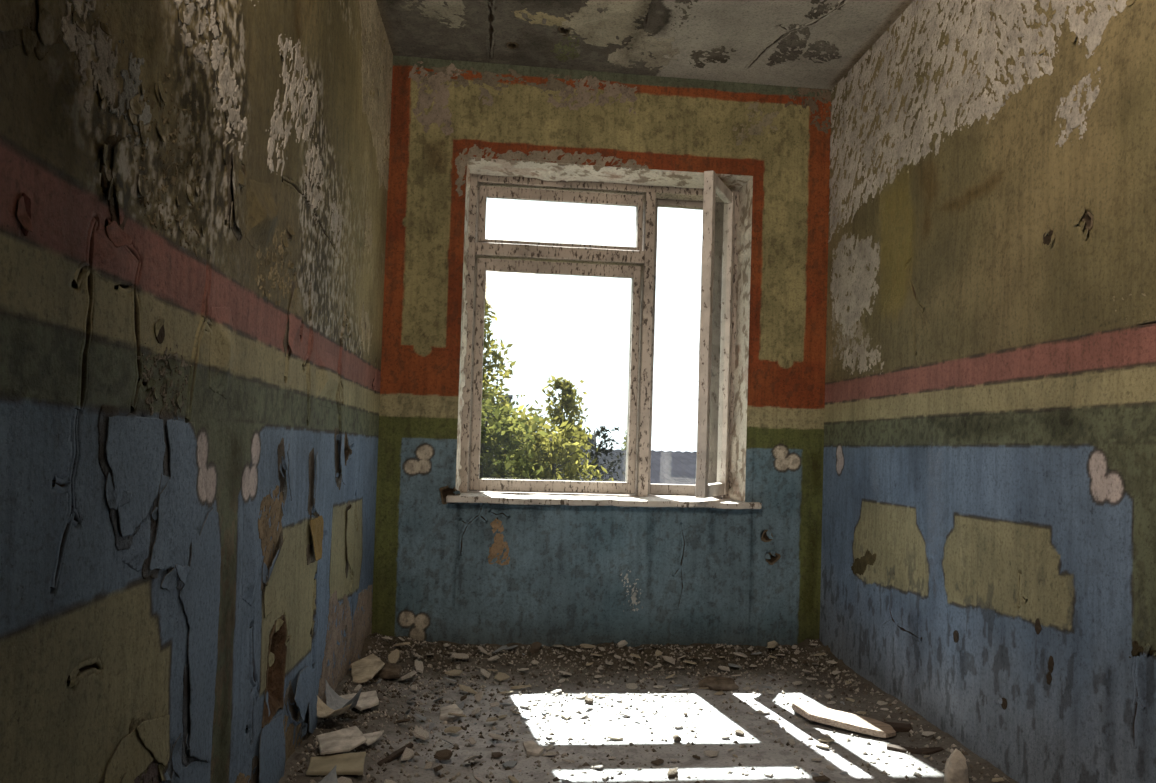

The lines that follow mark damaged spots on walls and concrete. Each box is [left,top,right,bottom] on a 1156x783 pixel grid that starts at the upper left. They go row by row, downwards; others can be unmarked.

peeling [174,0,247,241]
peeling [266,34,343,257]
peeling [514,0,736,70]
peeling [766,0,845,66]
peeling [784,0,1135,375]
crack [50,217,147,588]
peeling [97,404,222,783]
spalling [235,438,373,783]
crack [310,579,318,665]
crack [284,272,351,452]
peeling [334,428,354,490]
spalling [851,549,876,575]